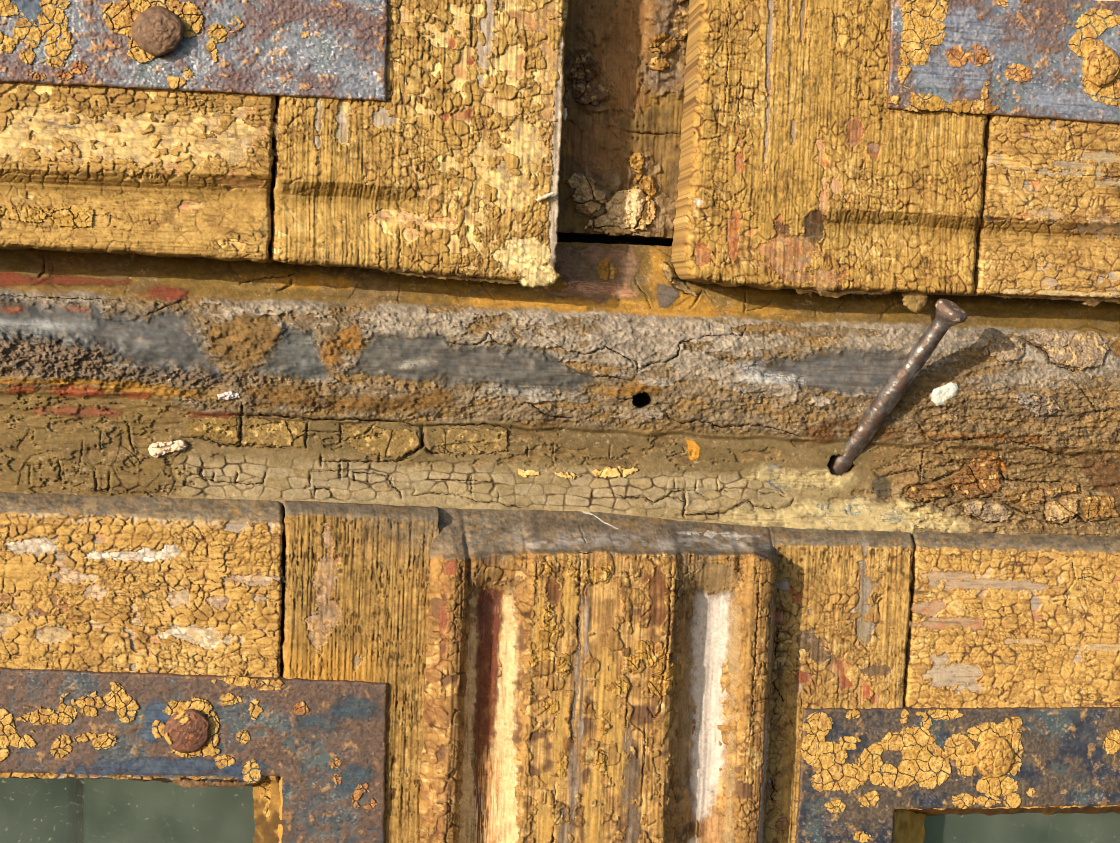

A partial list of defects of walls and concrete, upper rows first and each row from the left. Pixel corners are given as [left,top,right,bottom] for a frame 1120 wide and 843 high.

crack [723,10,742,125]
peeling [374,0,689,304]
peeling [148,416,307,457]
crack [184,402,573,508]
peeling [344,423,508,460]
crack [614,479,794,516]
corrosion [807,421,860,444]
peeling [718,451,1120,534]
peeling [930,382,959,406]
peeling [0,545,180,643]
peeling [459,554,612,843]
peeling [581,565,742,843]